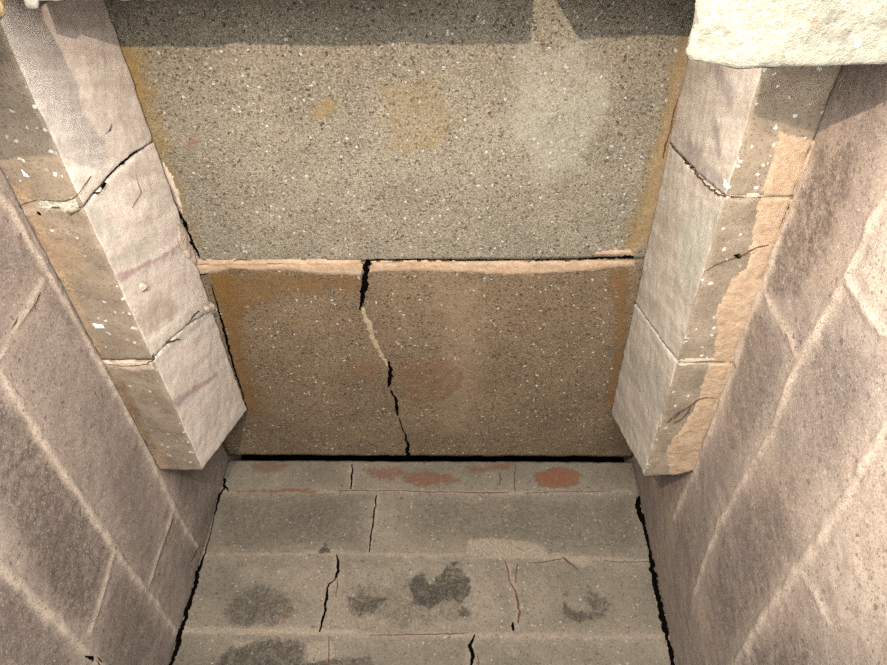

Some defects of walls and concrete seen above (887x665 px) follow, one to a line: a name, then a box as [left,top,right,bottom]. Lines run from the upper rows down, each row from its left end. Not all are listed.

crack [19,147,144,216]
crack [662,99,734,197]
crack [359,255,634,457]
rust [535,467,580,488]
crack [169,478,229,665]
water stain [182,626,358,663]
crack [319,554,340,665]
crack [370,632,479,665]
crack [604,496,675,665]